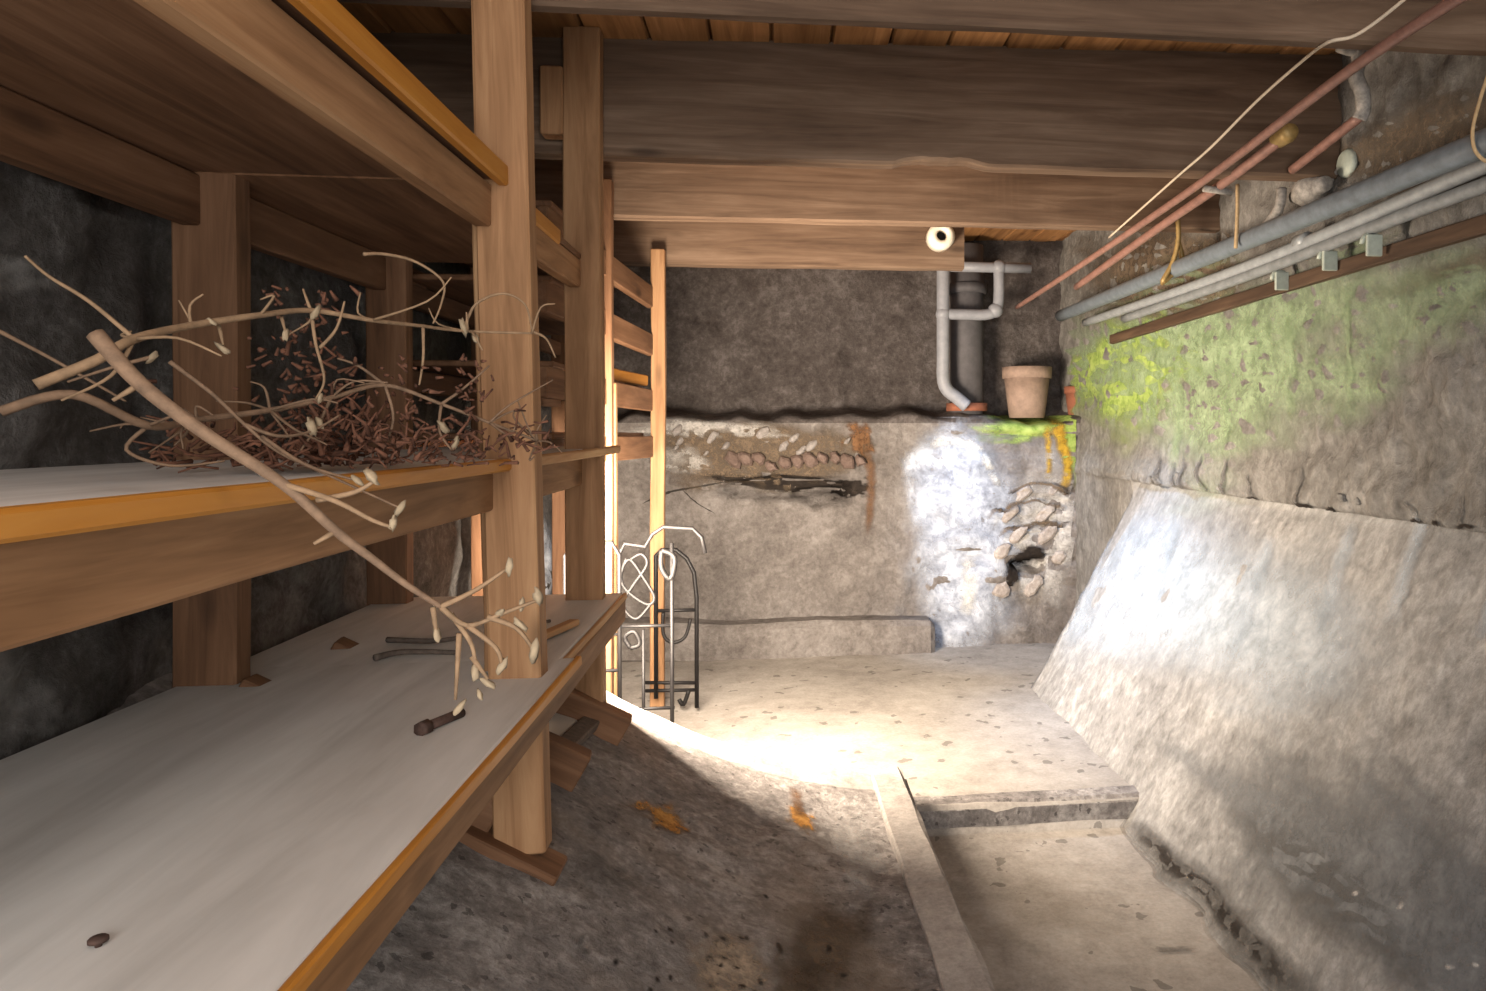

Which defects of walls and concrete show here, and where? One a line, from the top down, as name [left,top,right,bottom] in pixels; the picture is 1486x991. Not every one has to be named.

water stain [1339,95,1486,178]
water stain [1093,232,1239,316]
peeling [1012,461,1074,596]
water stain [777,911,869,991]